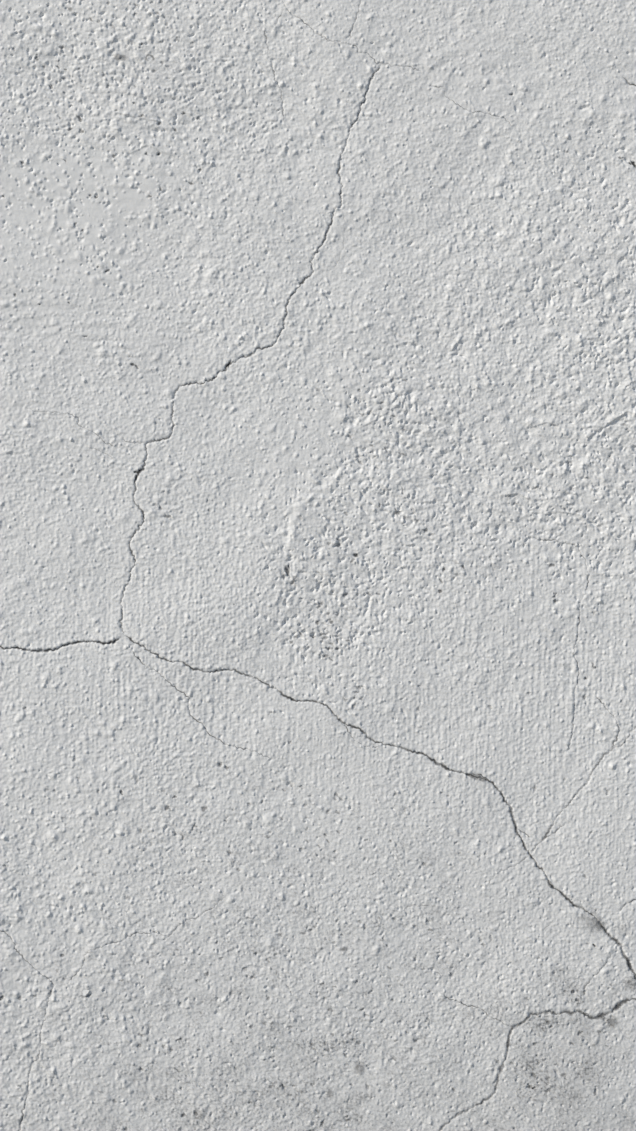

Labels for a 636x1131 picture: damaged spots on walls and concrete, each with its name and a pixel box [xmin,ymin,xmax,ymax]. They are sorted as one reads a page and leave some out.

crack [0,98,636,976]
crack [462,998,635,1105]